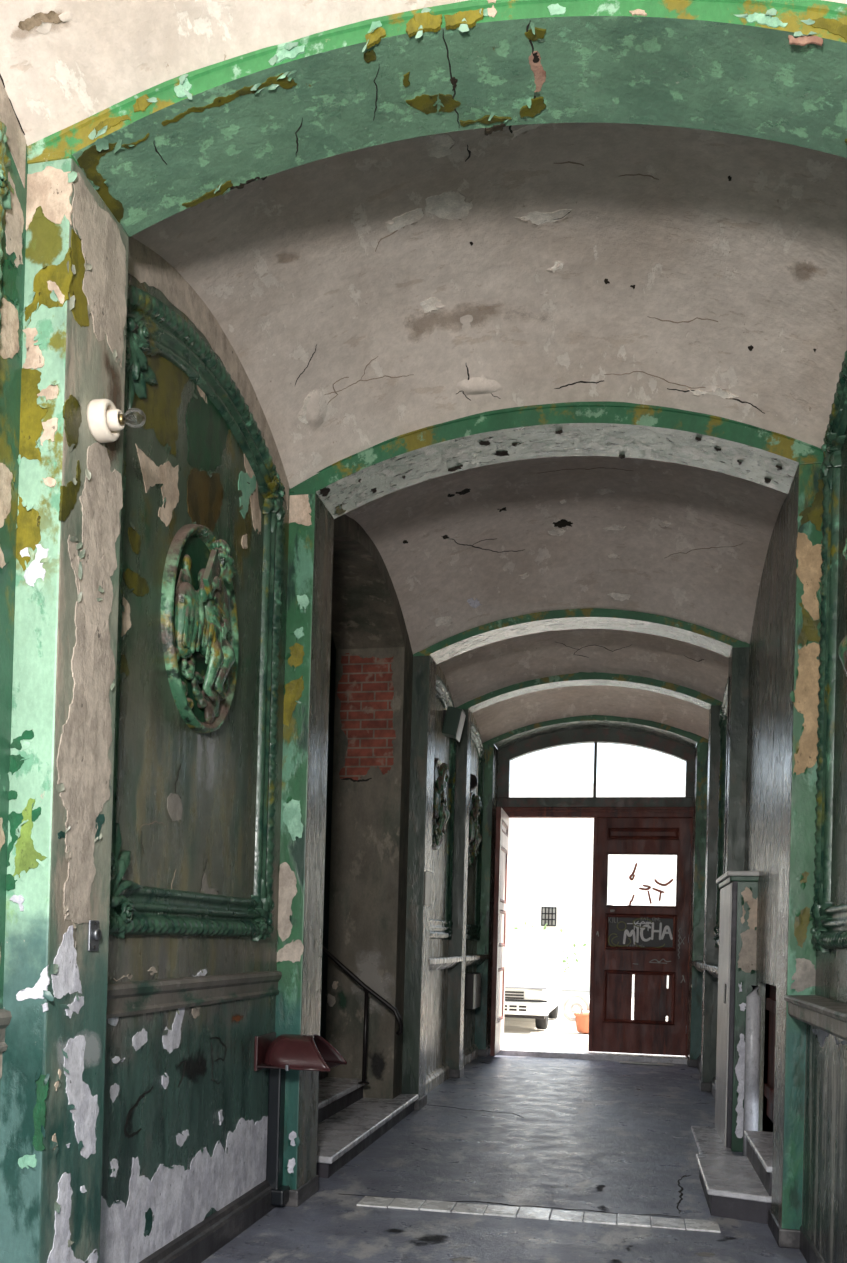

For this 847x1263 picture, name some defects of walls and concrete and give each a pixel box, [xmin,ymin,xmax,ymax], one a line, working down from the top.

peeling [406,0,497,38]
peeling [735,8,847,47]
peeling [161,42,306,126]
peeling [400,71,543,140]
crack [325,356,414,395]
crack [604,371,725,390]
peeling [132,354,261,552]
flaking render [0,94,157,1018]
peeling [790,479,824,779]
flaking render [18,1035,121,1175]
flaking render [47,1110,268,1263]
crack [449,1175,691,1217]